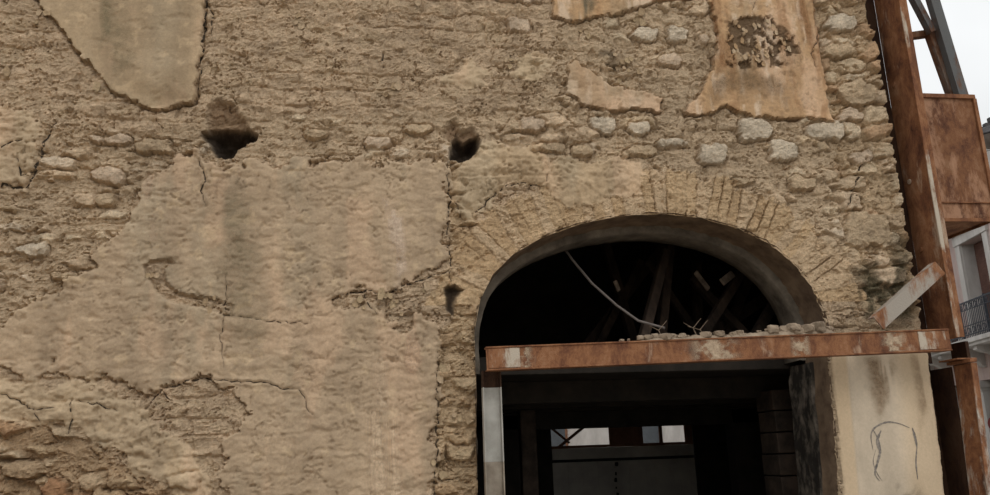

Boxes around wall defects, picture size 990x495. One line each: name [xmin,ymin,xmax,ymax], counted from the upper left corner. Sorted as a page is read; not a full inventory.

crack [197,0,214,103]
flaking render [0,0,804,163]
crack [1,123,56,189]
flaking render [143,258,235,317]
crack [3,394,108,434]
flaking render [332,272,478,495]
flaking render [0,420,174,495]